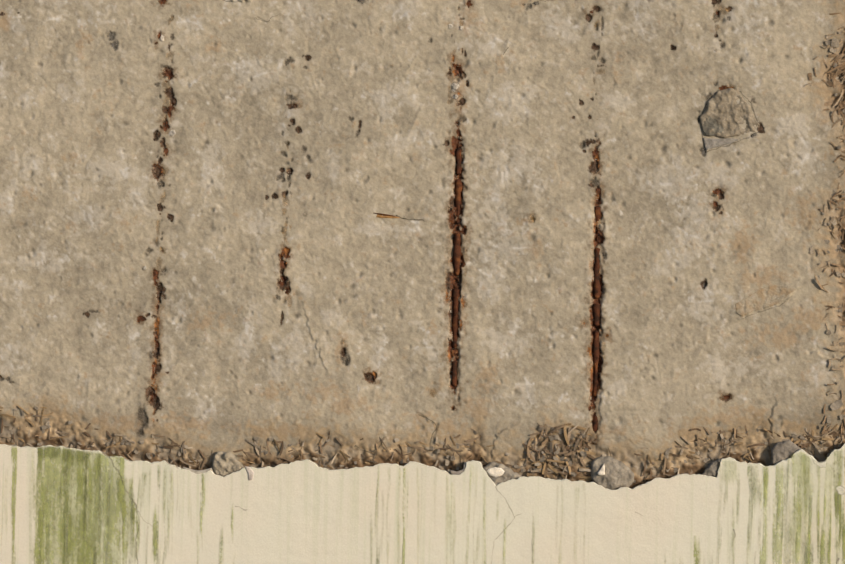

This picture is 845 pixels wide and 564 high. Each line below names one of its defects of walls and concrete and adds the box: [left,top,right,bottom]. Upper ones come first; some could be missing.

corrosion [585,6,603,34]
corrosion [712,0,732,47]
corrosion [152,31,177,222]
corrosion [265,119,302,200]
spalling [698,83,765,156]
corrosion [276,247,292,299]
corrosion [443,48,469,411]
corrosion [579,133,609,445]
corrosion [137,264,169,435]
leakage [34,447,139,564]
leakage [748,467,783,564]
leakage [794,457,845,564]